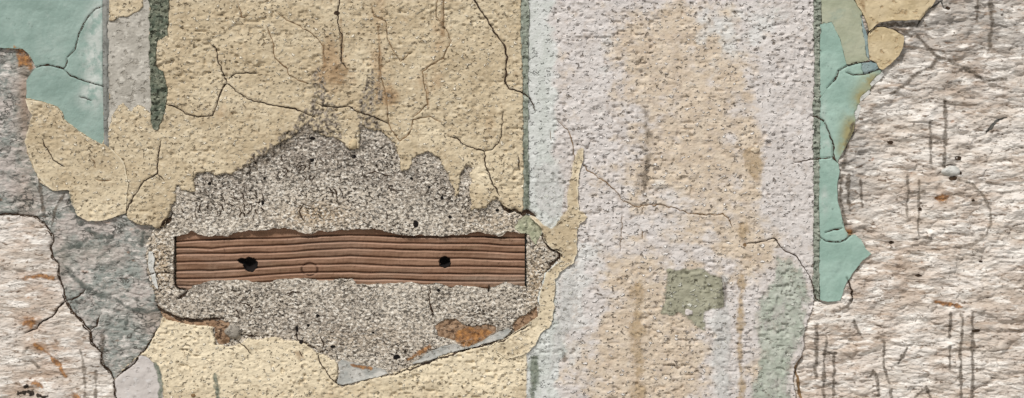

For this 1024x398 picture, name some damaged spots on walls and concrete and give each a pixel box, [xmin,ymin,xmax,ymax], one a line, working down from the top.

crack [38,6,104,101]
crack [126,141,164,212]
spalling [0,0,587,398]
crack [167,0,562,272]
crack [474,0,823,303]
spalling [752,0,1024,398]
rust [456,327,491,346]